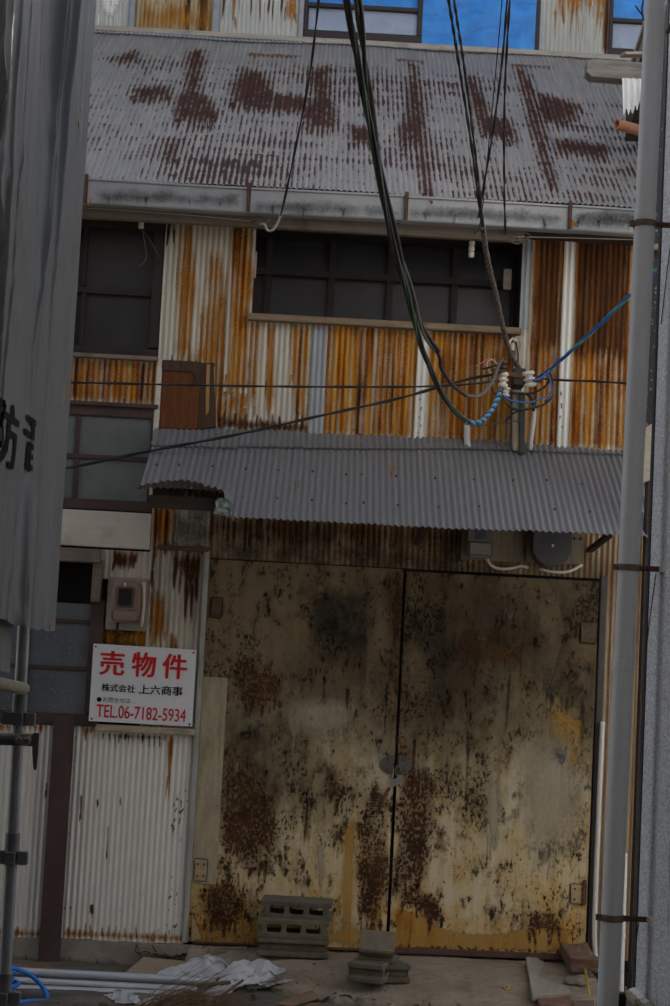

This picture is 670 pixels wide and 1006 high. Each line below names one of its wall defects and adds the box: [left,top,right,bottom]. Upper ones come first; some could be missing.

corrosion [554,0,609,54]
corrosion [126,49,371,166]
corrosion [394,59,435,204]
corrosion [464,64,615,192]
corrosion [66,358,156,404]
corrosion [166,224,310,433]
corrosion [323,326,418,438]
corrosion [427,331,516,442]
corrosion [526,240,565,446]
corrosion [103,508,200,649]
corrosion [198,733,298,937]
corrosion [313,731,447,949]